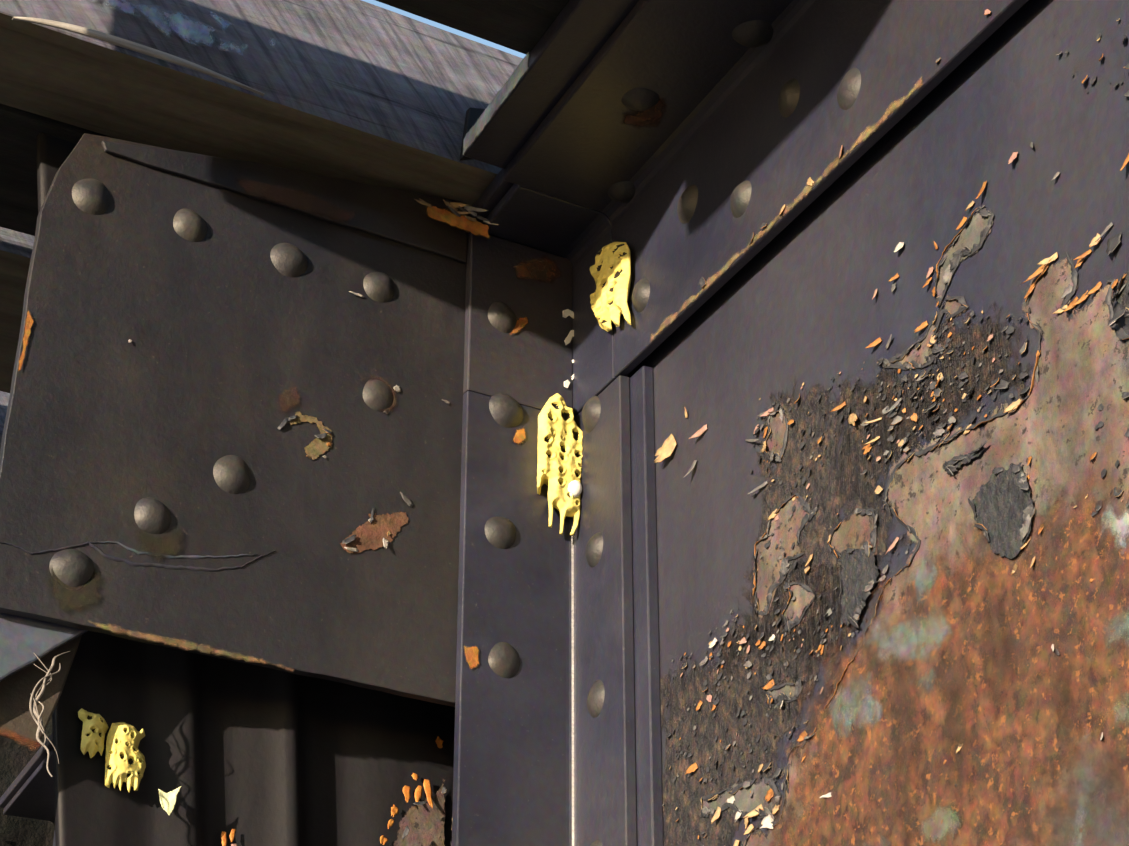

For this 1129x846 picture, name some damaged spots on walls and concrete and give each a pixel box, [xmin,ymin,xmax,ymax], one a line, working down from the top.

water stain [108,0,243,52]
rust [415,198,498,238]
peeling [278,411,332,460]
peeling [654,181,1129,846]
crack [0,541,276,571]
rust [773,475,1129,846]